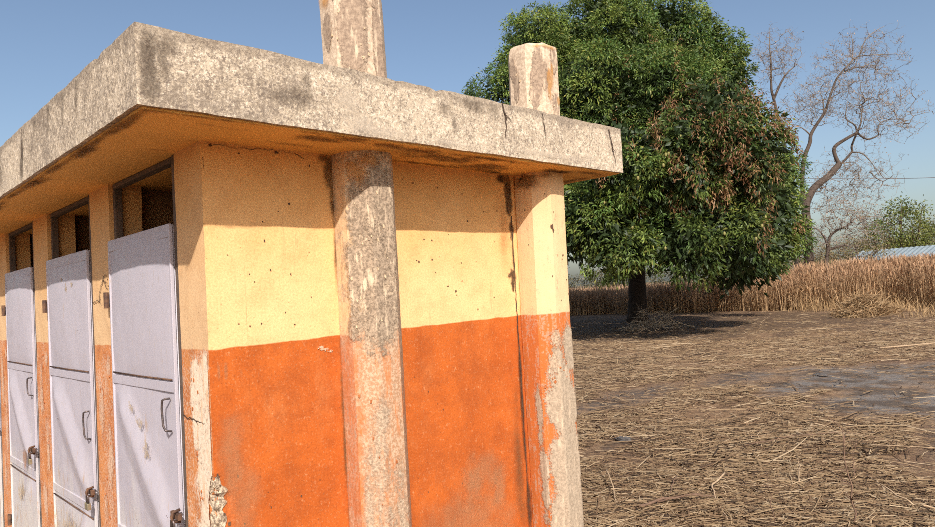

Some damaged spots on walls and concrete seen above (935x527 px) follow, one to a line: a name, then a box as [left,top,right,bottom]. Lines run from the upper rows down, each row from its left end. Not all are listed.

crack [203,143,307,167]
leakage [285,136,535,291]
peeling [190,351,231,527]
peeling [535,322,584,527]